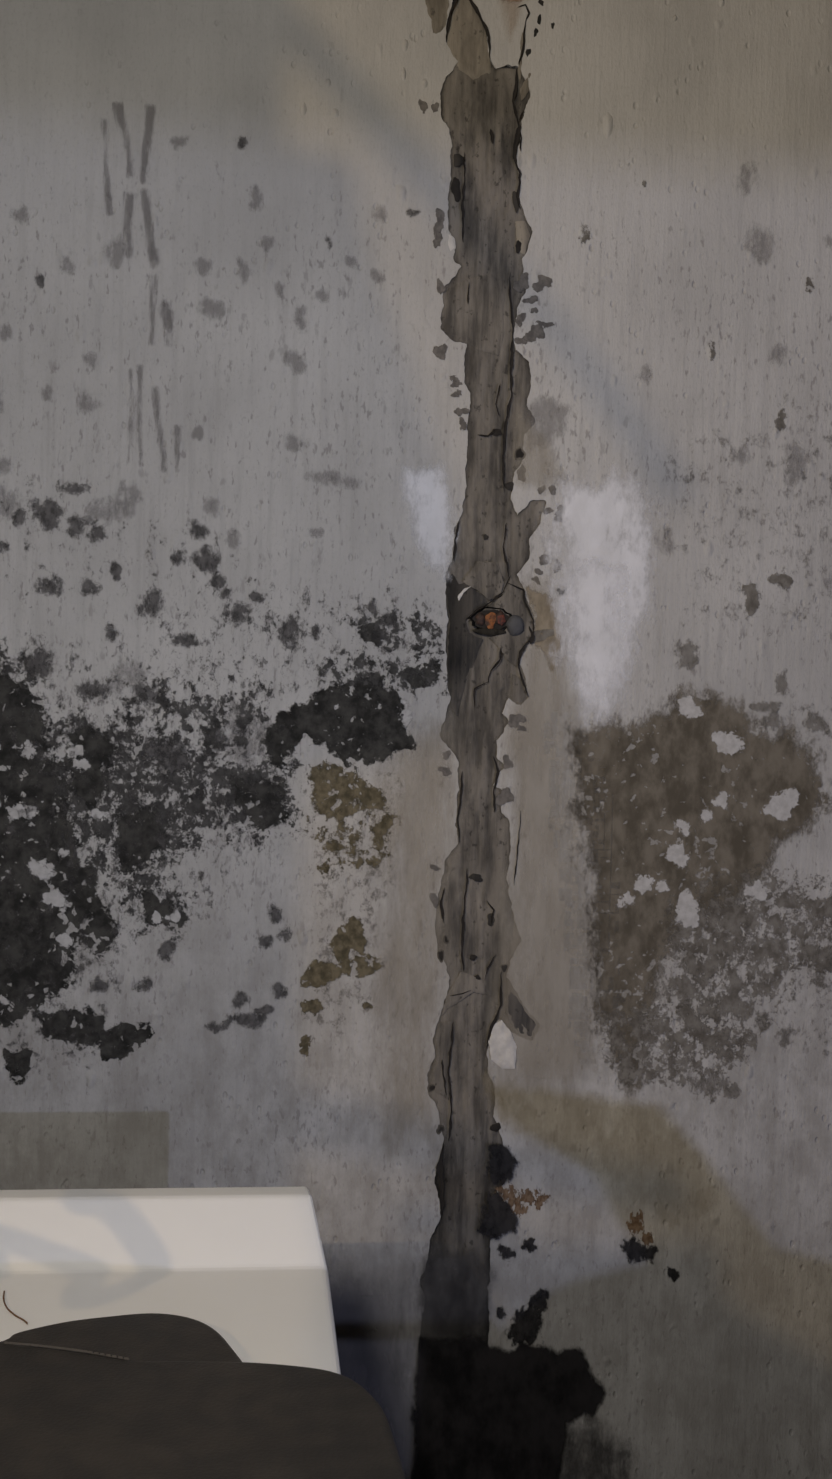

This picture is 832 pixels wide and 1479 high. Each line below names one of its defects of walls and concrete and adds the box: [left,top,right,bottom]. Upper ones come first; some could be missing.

spalling [425,0,555,81]
peeling [418,99,439,113]
peeling [433,154,465,248]
peeling [513,272,554,345]
peeling [433,344,470,430]
leakage [775,409,786,431]
leakage [0,480,105,552]
peeling [504,446,563,522]
corrosion [485,612,506,629]
spalling [446,554,565,731]
leakage [0,521,448,1085]
leakage [526,471,832,1102]